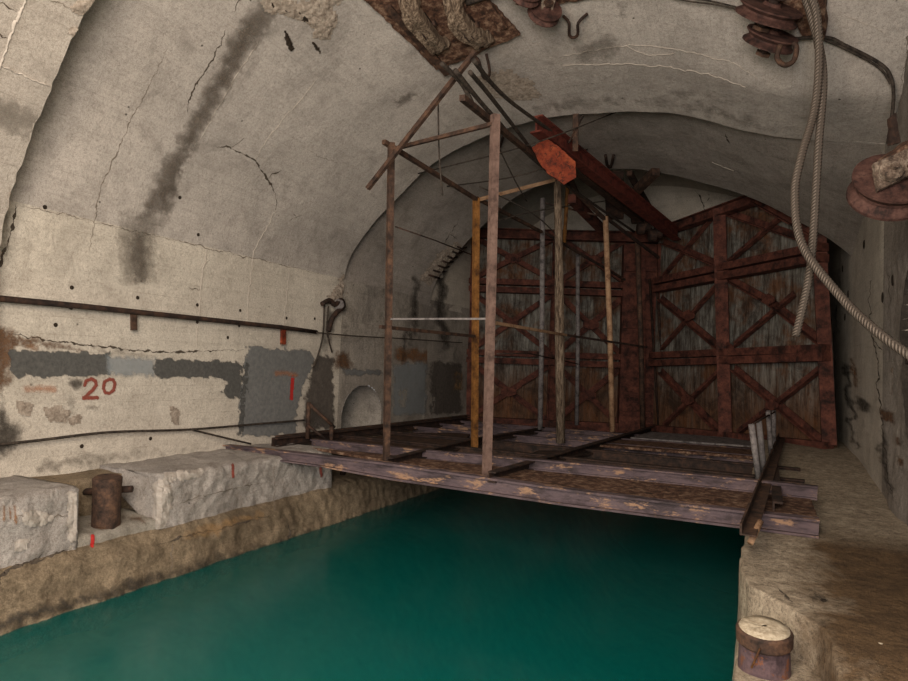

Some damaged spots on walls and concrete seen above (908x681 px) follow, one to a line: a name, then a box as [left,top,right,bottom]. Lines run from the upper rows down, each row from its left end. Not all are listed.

spalling [260,0,343,54]
crack [187,31,225,113]
crack [0,57,312,273]
damp [124,10,270,281]
crack [8,333,243,354]
peeling [8,346,382,437]
peeling [393,360,462,415]